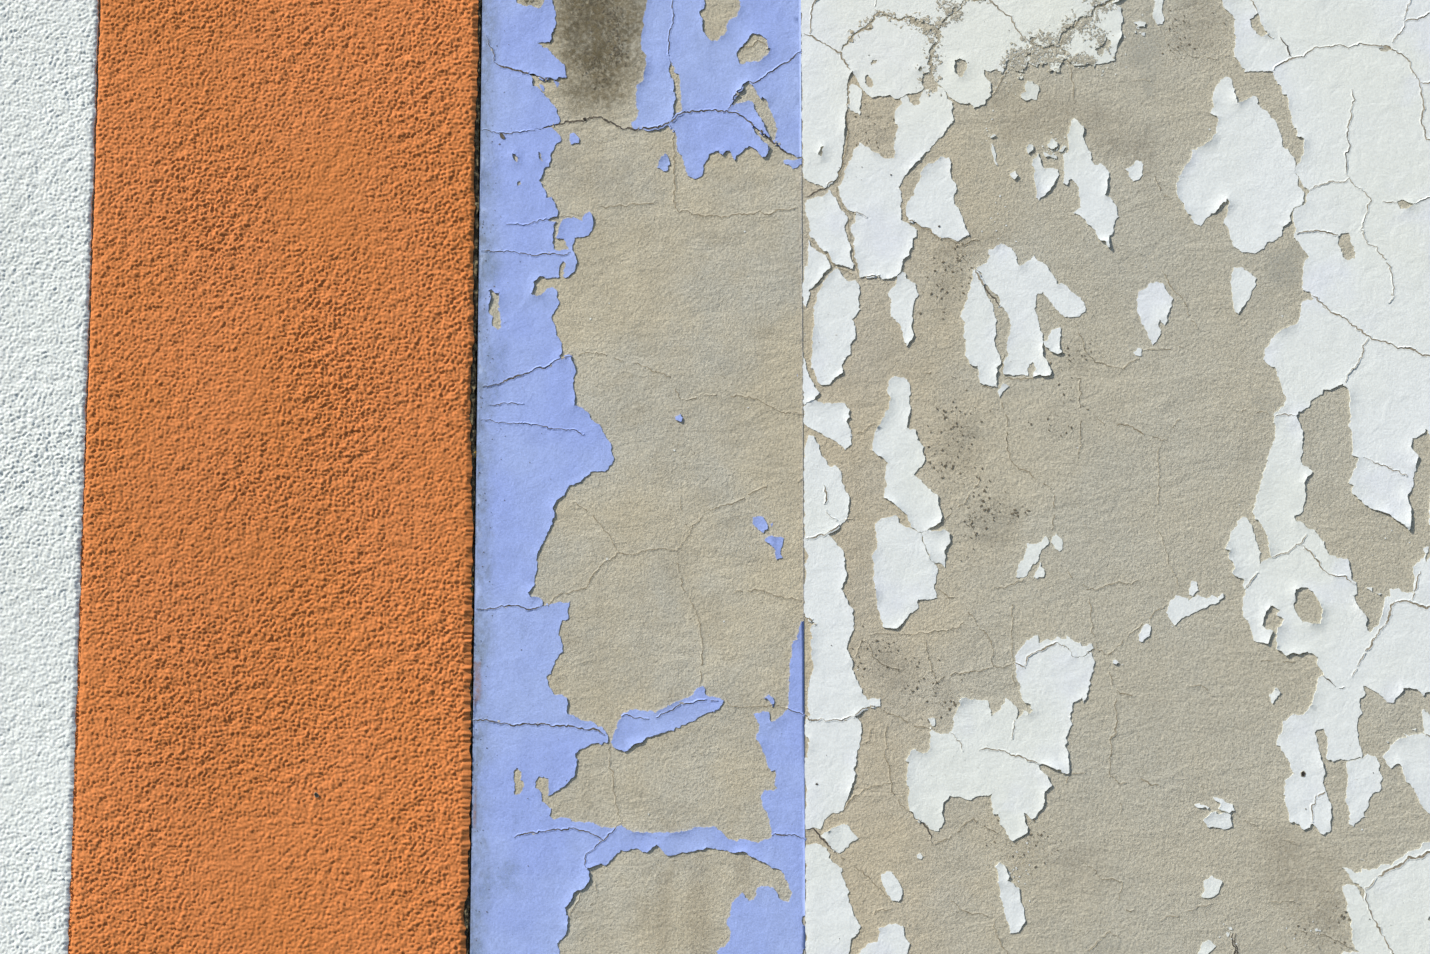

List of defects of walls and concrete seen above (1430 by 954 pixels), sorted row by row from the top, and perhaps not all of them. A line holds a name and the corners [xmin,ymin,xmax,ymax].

damp [557,0,644,101]
crack [1250,0,1430,142]
crack [481,0,1152,291]
crack [1296,89,1430,304]
peeling [488,289,501,330]
crack [903,208,1004,310]
crack [1311,294,1430,382]
peeling [514,0,1430,954]
crack [473,252,1199,927]
crack [1244,534,1357,589]
crack [1260,571,1430,690]
crack [1268,849,1430,954]